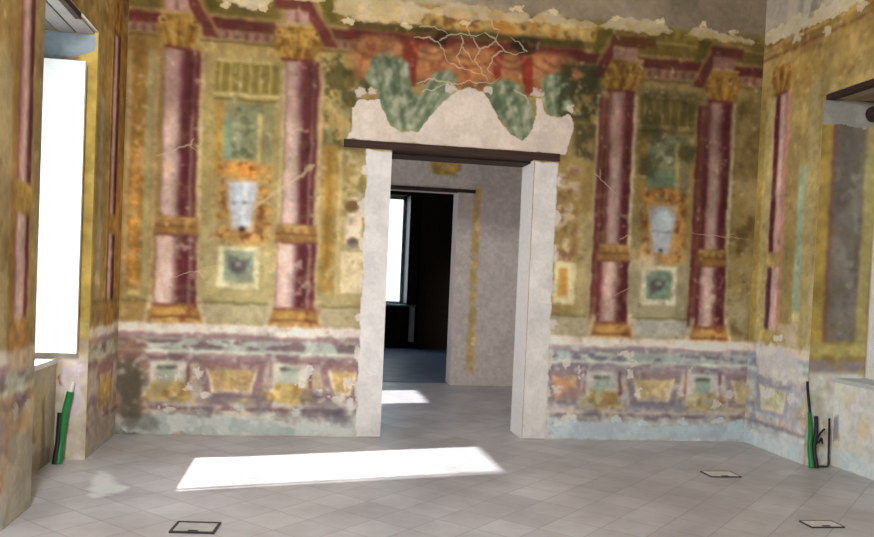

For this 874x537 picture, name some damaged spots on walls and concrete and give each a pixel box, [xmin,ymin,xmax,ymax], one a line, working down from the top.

peeling [220,0,273,13]
crack [414,20,531,105]
peeling [294,0,870,49]
spalling [61,83,805,463]